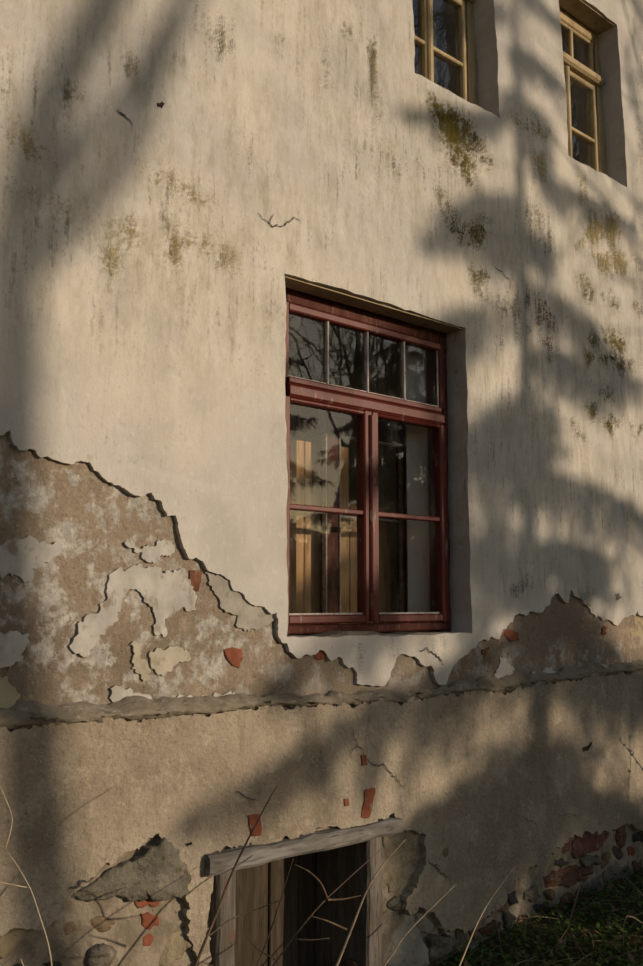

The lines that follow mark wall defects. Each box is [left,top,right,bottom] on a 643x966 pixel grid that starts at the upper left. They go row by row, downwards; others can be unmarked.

water stain [461,134,494,187]
water stain [471,266,547,334]
flaking render [0,535,62,583]
flaking render [0,631,30,672]
flaking render [68,539,202,702]
flaking render [224,647,243,668]
flaking render [482,656,515,679]
flaking render [503,630,519,642]